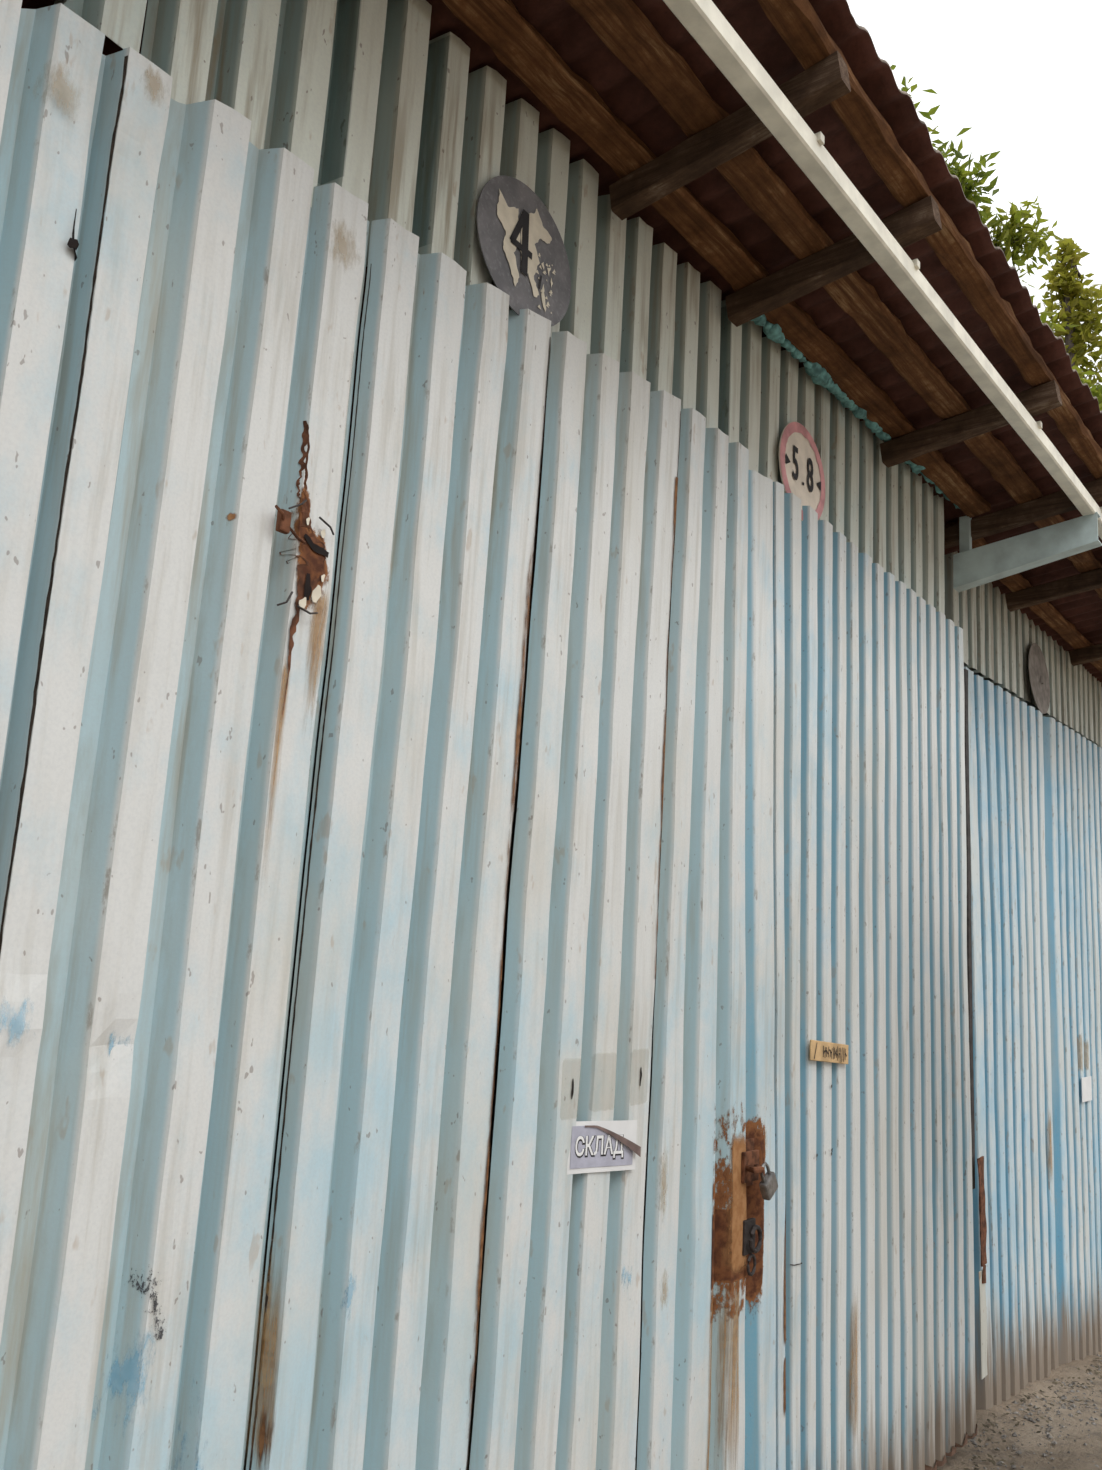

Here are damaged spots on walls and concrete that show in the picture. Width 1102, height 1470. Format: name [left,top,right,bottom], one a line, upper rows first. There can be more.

corrosion [292,487,329,688]
corrosion [272,667,289,794]
corrosion [257,1284,278,1463]
corrosion [707,1102,766,1470]
corrosion [925,1424,977,1470]